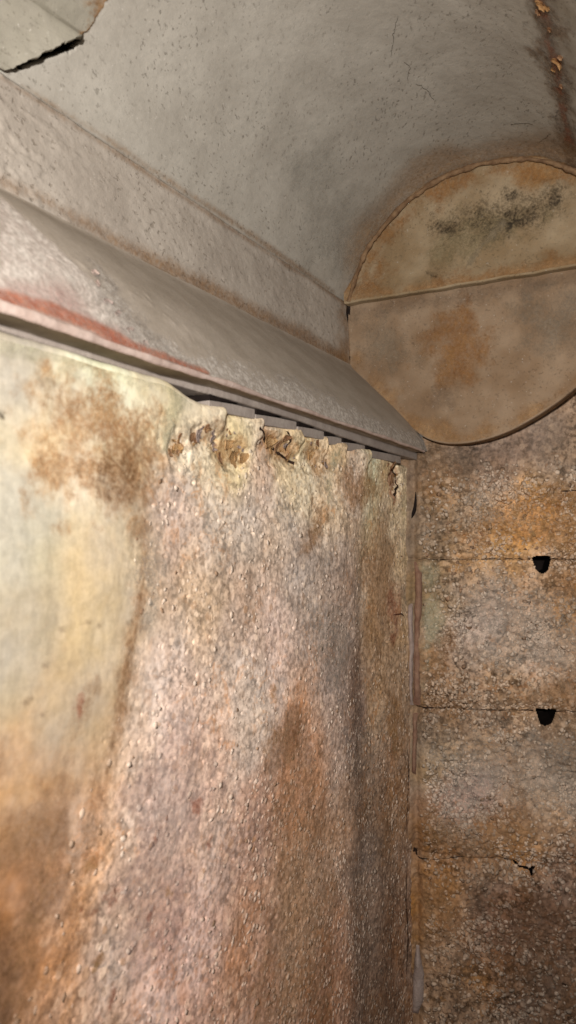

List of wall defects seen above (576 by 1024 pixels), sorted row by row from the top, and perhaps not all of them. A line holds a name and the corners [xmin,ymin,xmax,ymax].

peeling [534,0,550,16]
peeling [551,55,563,89]
corrosion [0,291,208,374]
corrosion [32,367,150,502]
spalling [168,420,250,468]
peeling [259,427,328,473]
crack [406,750,514,974]